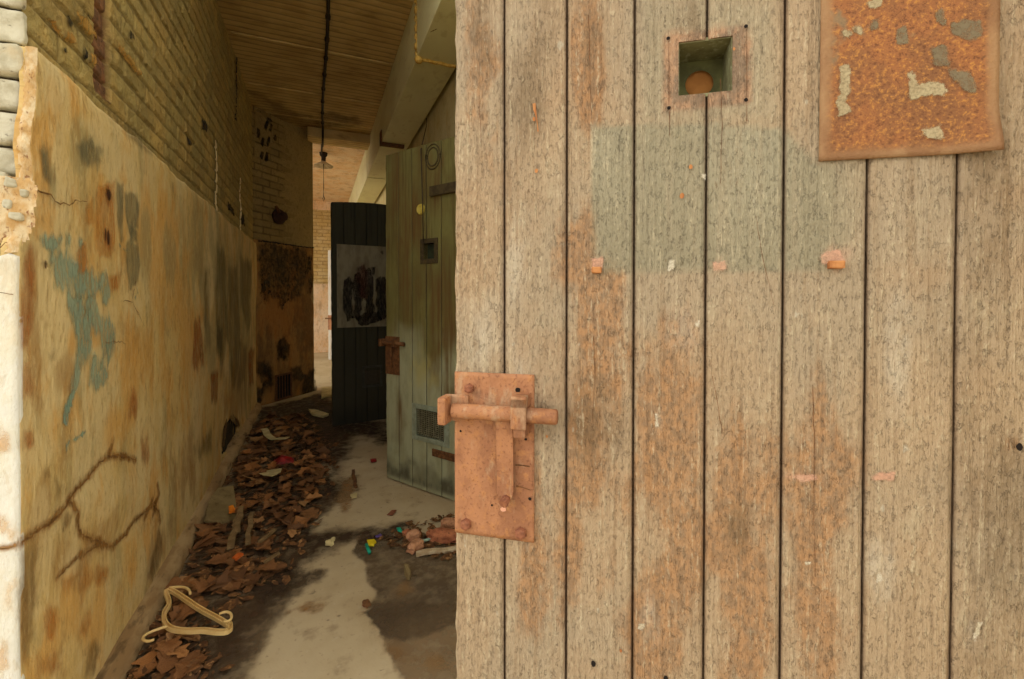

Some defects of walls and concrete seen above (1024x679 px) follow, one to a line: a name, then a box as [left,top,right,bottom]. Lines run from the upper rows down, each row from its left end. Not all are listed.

peeling [0,46,114,425]
crack [0,441,161,578]
water stain [353,533,457,679]